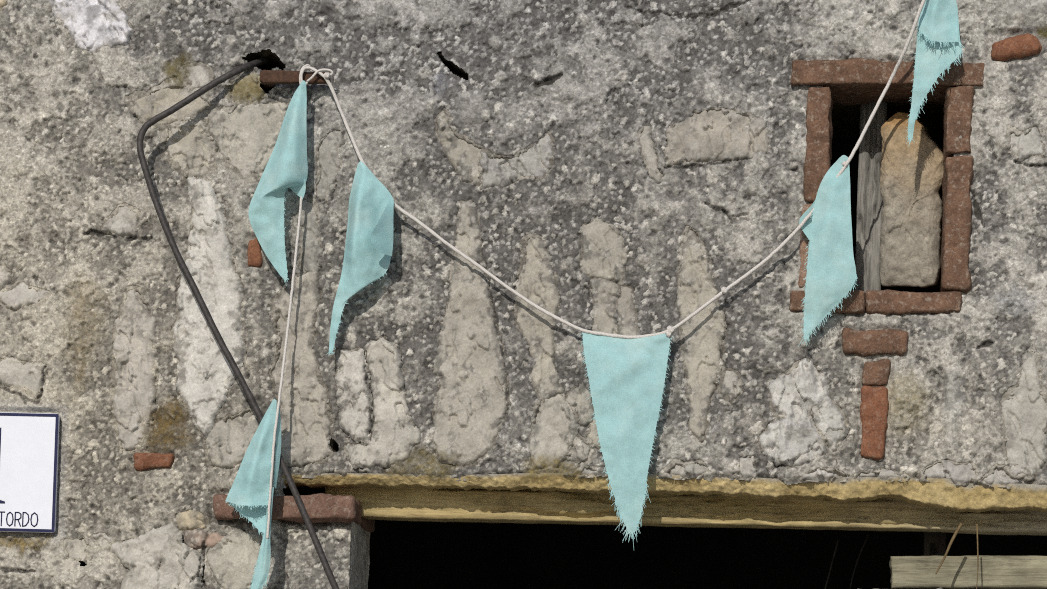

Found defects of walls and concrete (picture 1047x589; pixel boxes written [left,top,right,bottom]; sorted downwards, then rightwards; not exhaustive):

crack [625,0,751,25]